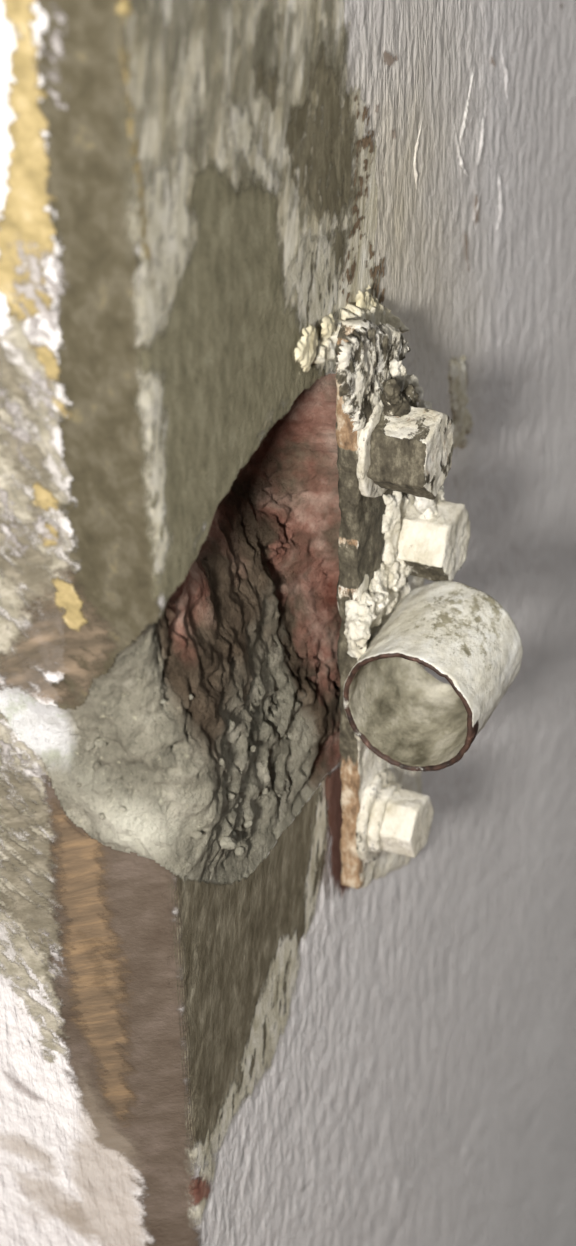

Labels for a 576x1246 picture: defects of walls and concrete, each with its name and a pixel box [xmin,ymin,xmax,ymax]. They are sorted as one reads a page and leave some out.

spalling [0,0,409,1246]
rust [324,767,348,894]
rust [189,1177,210,1205]